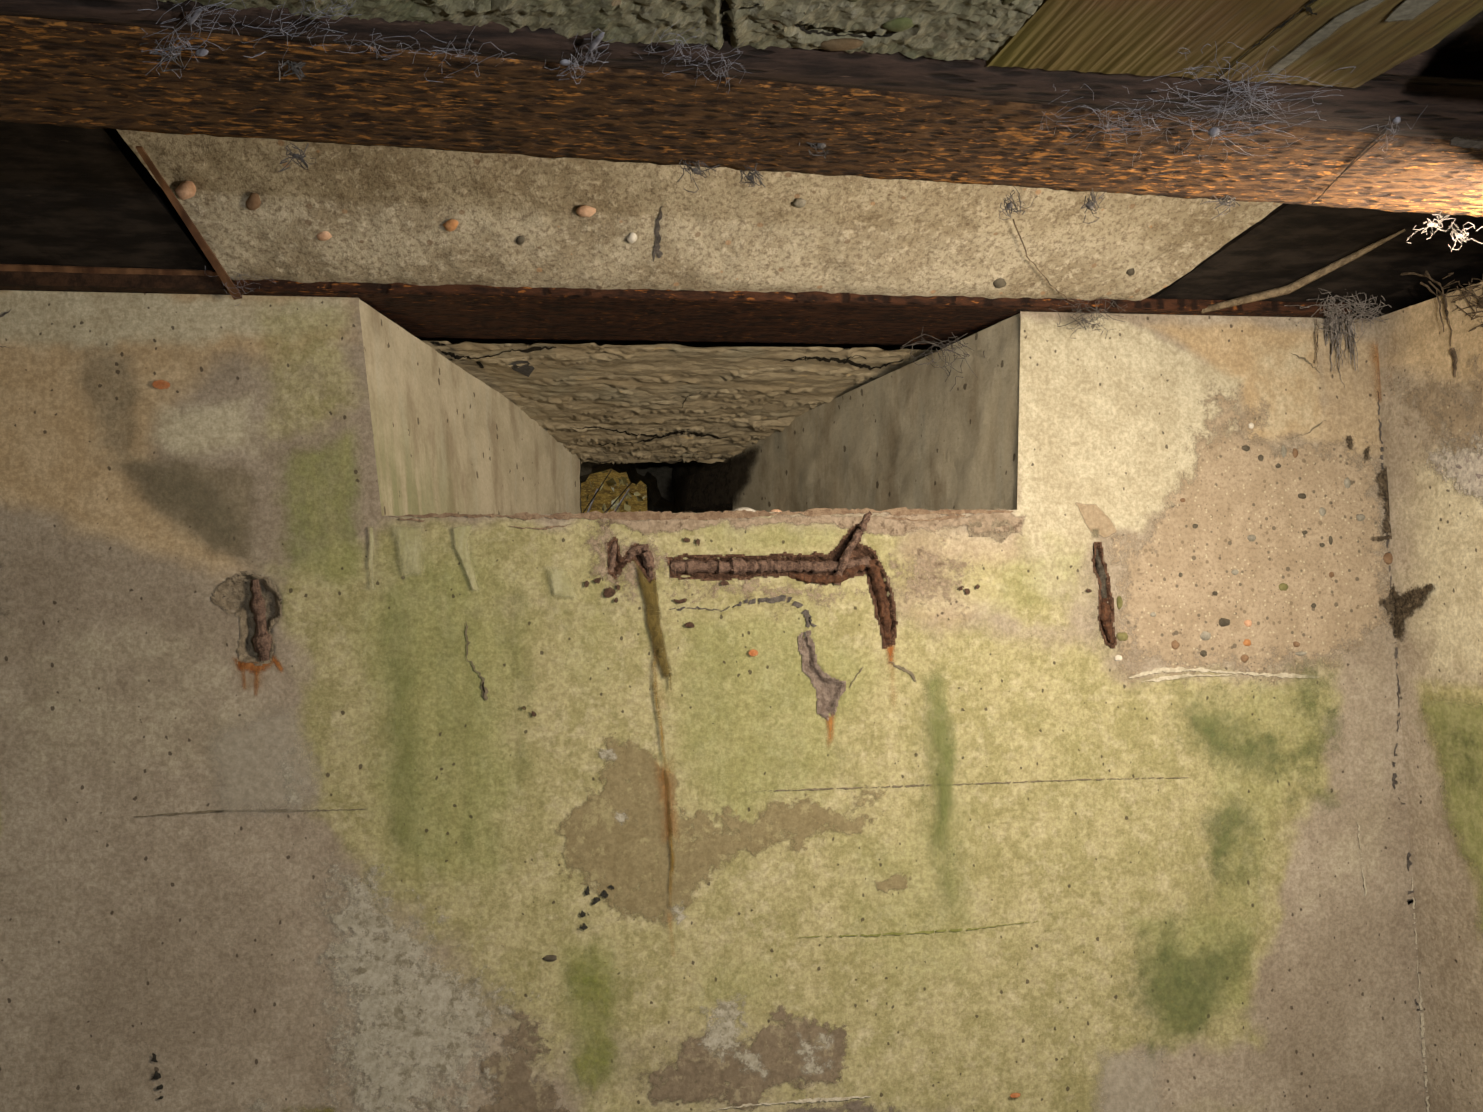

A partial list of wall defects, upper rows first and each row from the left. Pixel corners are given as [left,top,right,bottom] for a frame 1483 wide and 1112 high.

spalling [1076,392,1435,682]
crack [1377,391,1405,804]
corrosion [236,657,283,689]
crack [1407,852,1416,905]
damp [579,885,614,930]